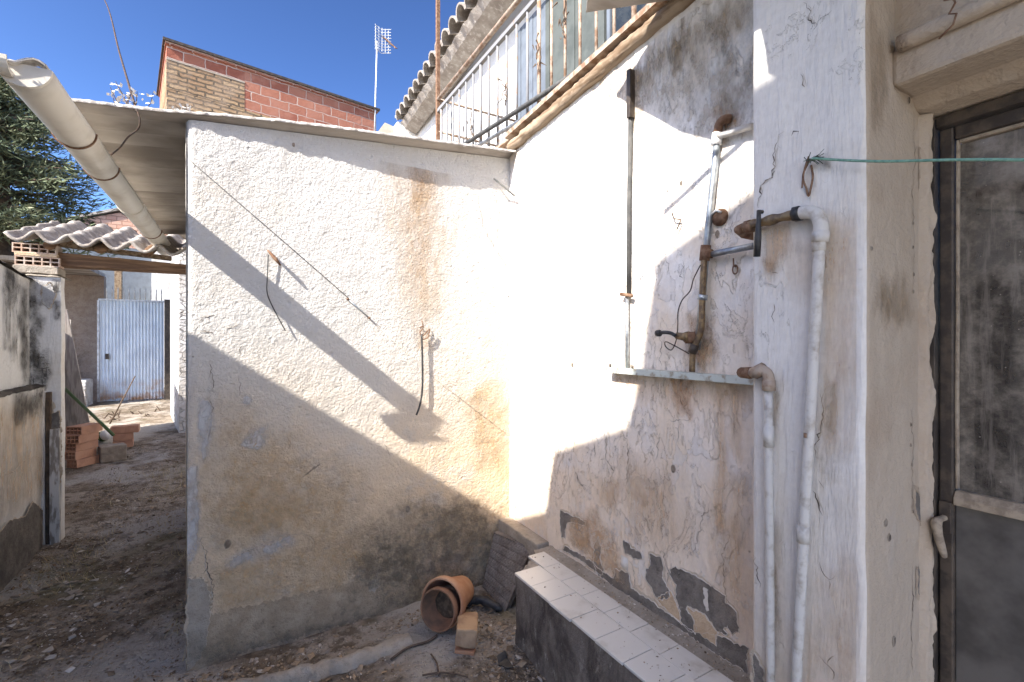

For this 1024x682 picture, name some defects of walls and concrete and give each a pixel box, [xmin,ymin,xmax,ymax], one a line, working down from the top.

crack [757,131,799,206]
leakage [3,269,51,497]
crack [575,431,629,517]
spalling [560,509,766,682]